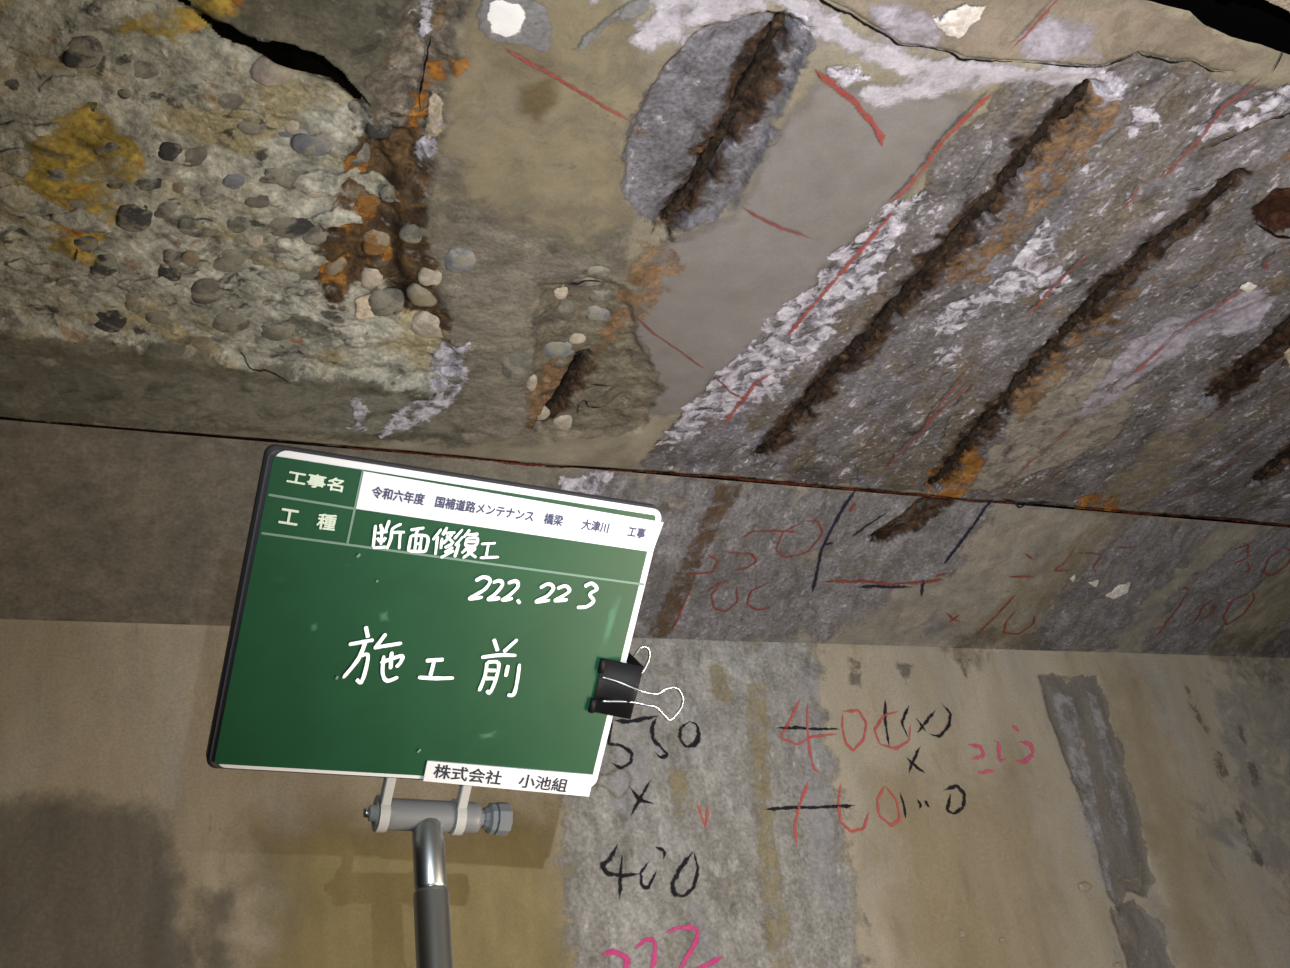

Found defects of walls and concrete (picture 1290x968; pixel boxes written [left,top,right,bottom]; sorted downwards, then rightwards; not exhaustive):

spalling [0,0,473,397]
crack [178,0,373,109]
rust [314,58,477,338]
crack [419,37,431,109]
spalling [502,265,668,441]
water stain [0,0,1290,626]
rust [526,11,794,428]
spalling [621,10,815,232]
rust [610,168,1253,638]
rust [753,78,1120,455]
peeling [640,52,1290,525]
crack [820,0,1228,73]